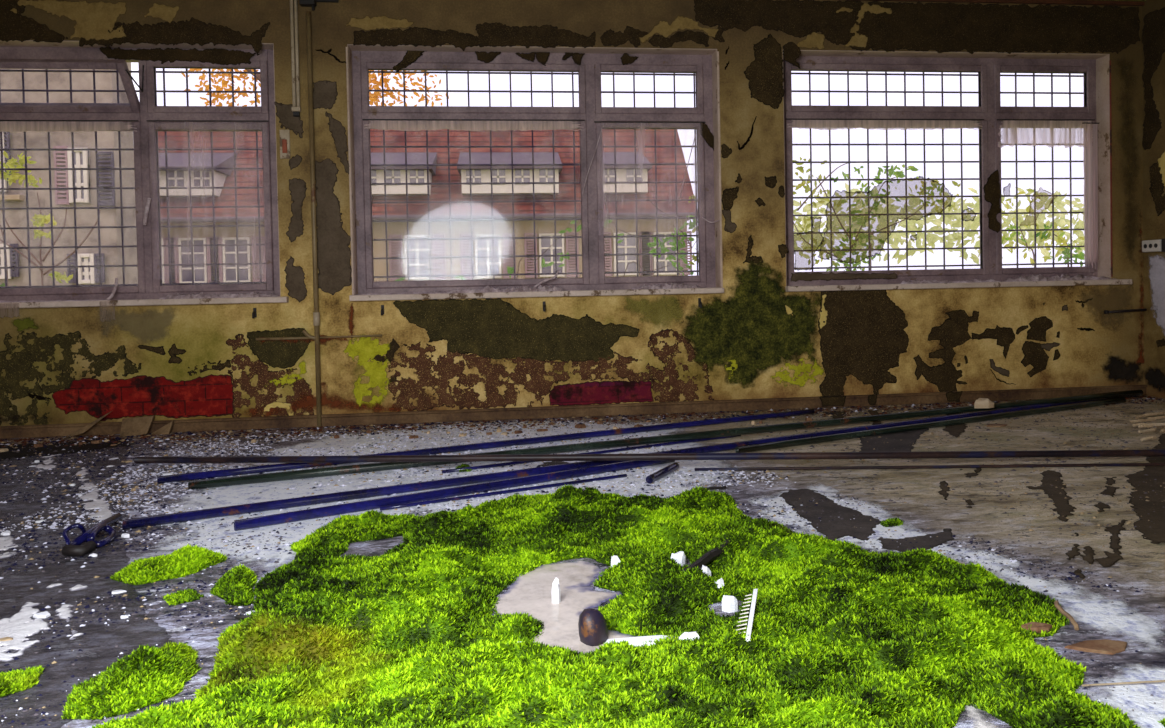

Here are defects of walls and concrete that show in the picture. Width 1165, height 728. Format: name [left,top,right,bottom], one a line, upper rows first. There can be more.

peeling [0,0,270,65]
peeling [353,0,1165,150]
peeling [274,101,304,138]
peeling [700,123,732,158]
peeling [284,80,352,303]
peeling [721,173,742,233]
peeling [755,176,785,207]
peeling [1149,162,1165,216]
peeling [743,235,763,263]
spalling [0,328,314,426]
peeling [373,298,714,412]
peeling [791,272,1060,396]